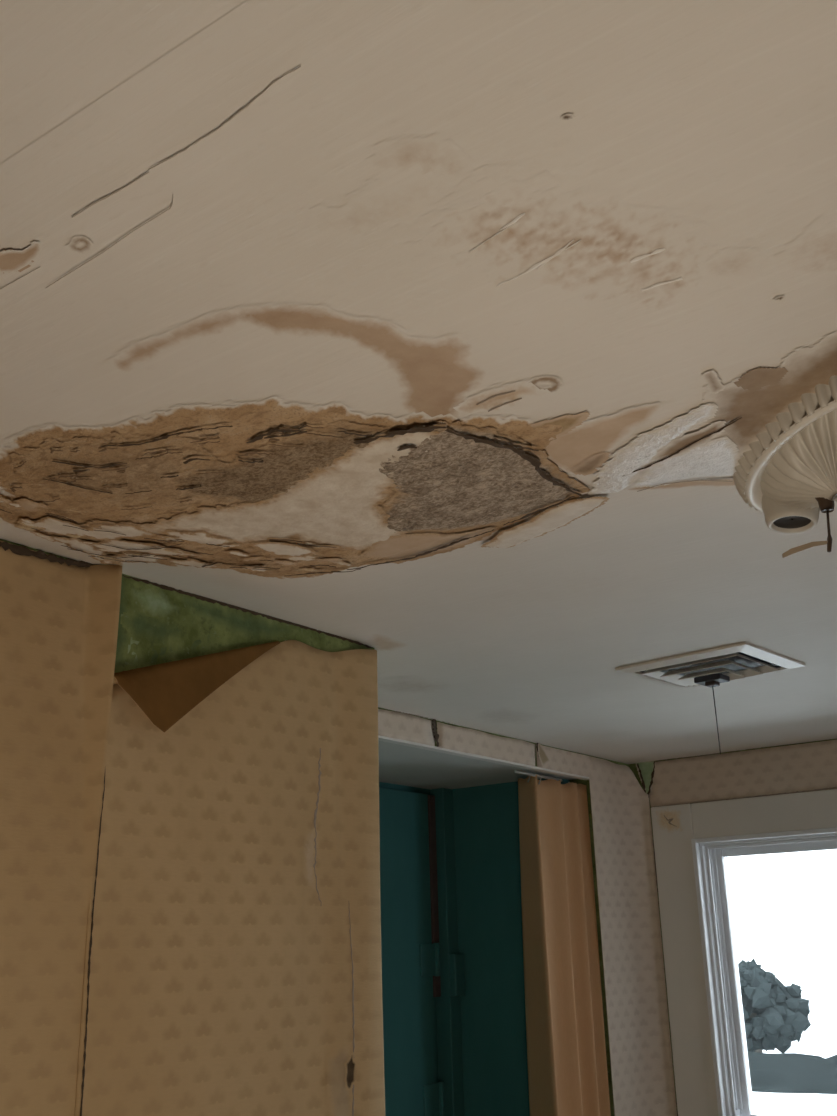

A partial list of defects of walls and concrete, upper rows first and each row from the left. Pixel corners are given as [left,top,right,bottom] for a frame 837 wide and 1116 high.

crack [72,66,301,218]
crack [0,199,173,289]
water stain [106,301,492,419]
water stain [701,331,837,456]
peeling [0,375,742,673]